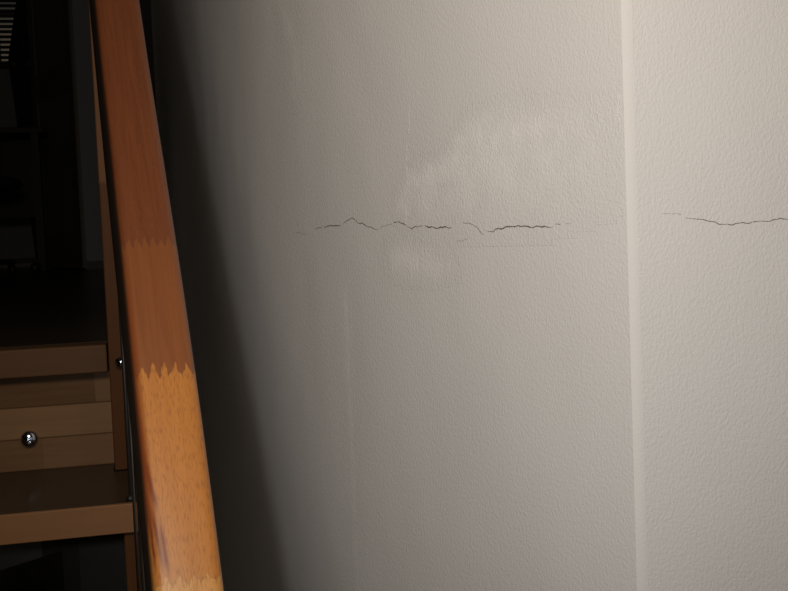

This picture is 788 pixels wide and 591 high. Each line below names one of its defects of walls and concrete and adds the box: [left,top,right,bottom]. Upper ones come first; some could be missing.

crack [316,218,451,230]
crack [470,223,560,232]
crack [691,217,788,225]